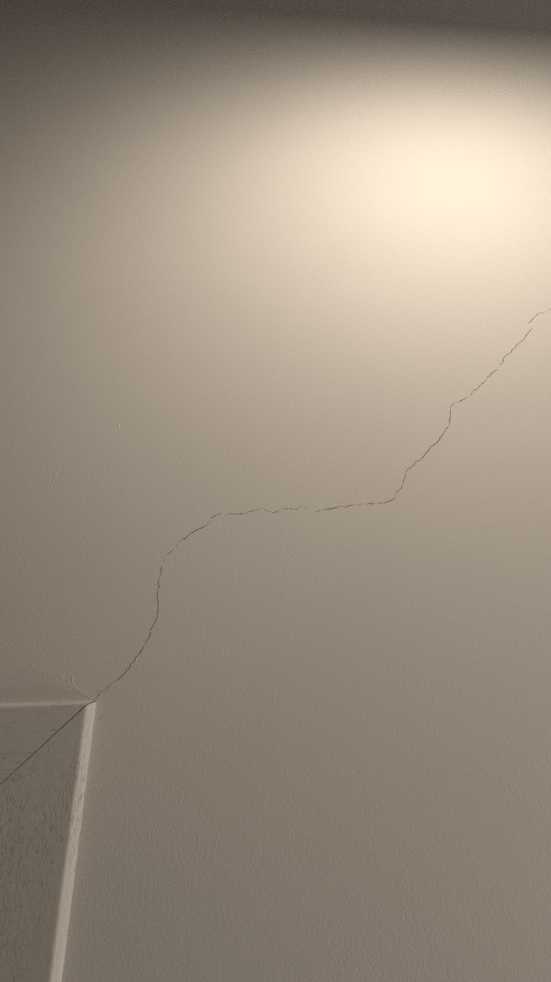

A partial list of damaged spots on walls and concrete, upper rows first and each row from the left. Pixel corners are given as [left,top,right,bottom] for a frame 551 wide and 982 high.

crack [97,309,551,720]